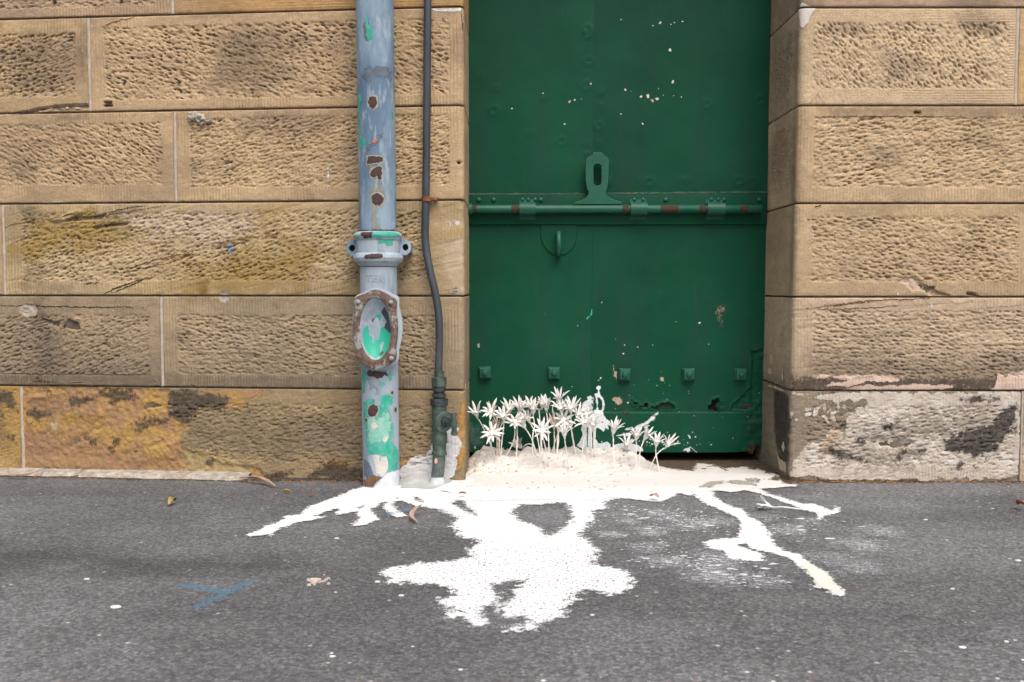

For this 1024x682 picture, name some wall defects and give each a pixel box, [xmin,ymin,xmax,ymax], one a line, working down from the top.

corrosion [367,156,383,180]
corrosion [371,193,384,206]
crack [5,205,161,253]
peeling [790,369,1024,481]